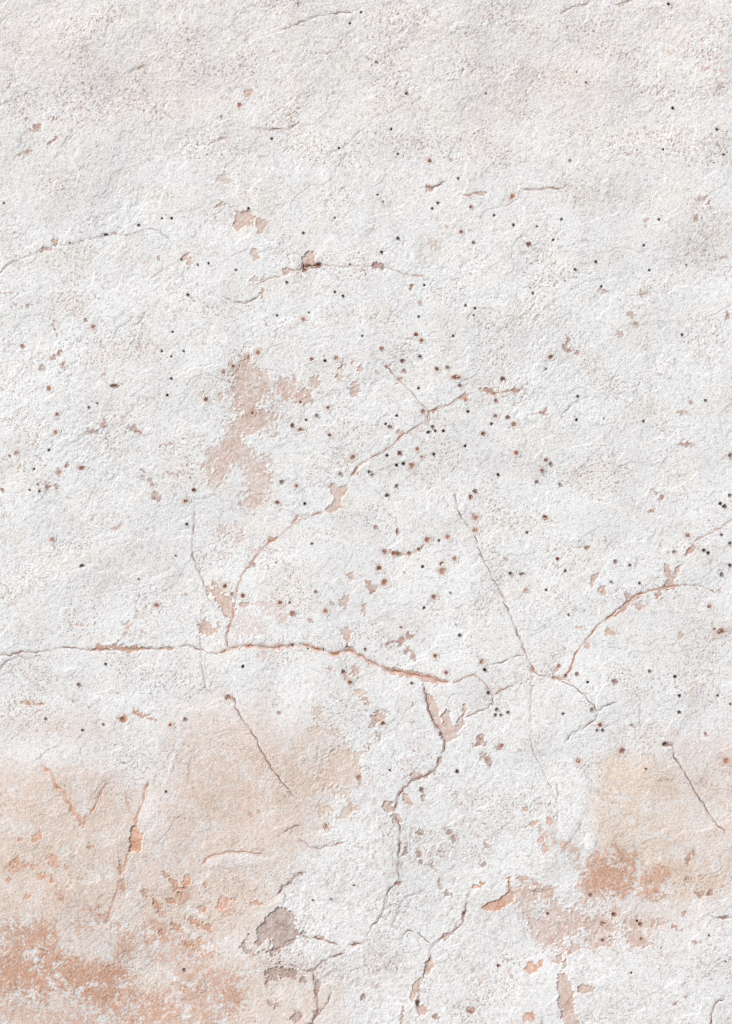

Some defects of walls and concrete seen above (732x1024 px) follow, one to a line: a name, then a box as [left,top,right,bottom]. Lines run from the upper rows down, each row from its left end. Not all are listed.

peeling [209,198,269,235]
crack [350,359,592,477]
damp [0,672,367,1024]
spalling [139,870,309,1024]
crack [0,491,732,1024]
peeling [400,827,454,899]
peeling [443,826,461,845]
peeling [468,839,714,1024]
damp [564,640,732,949]